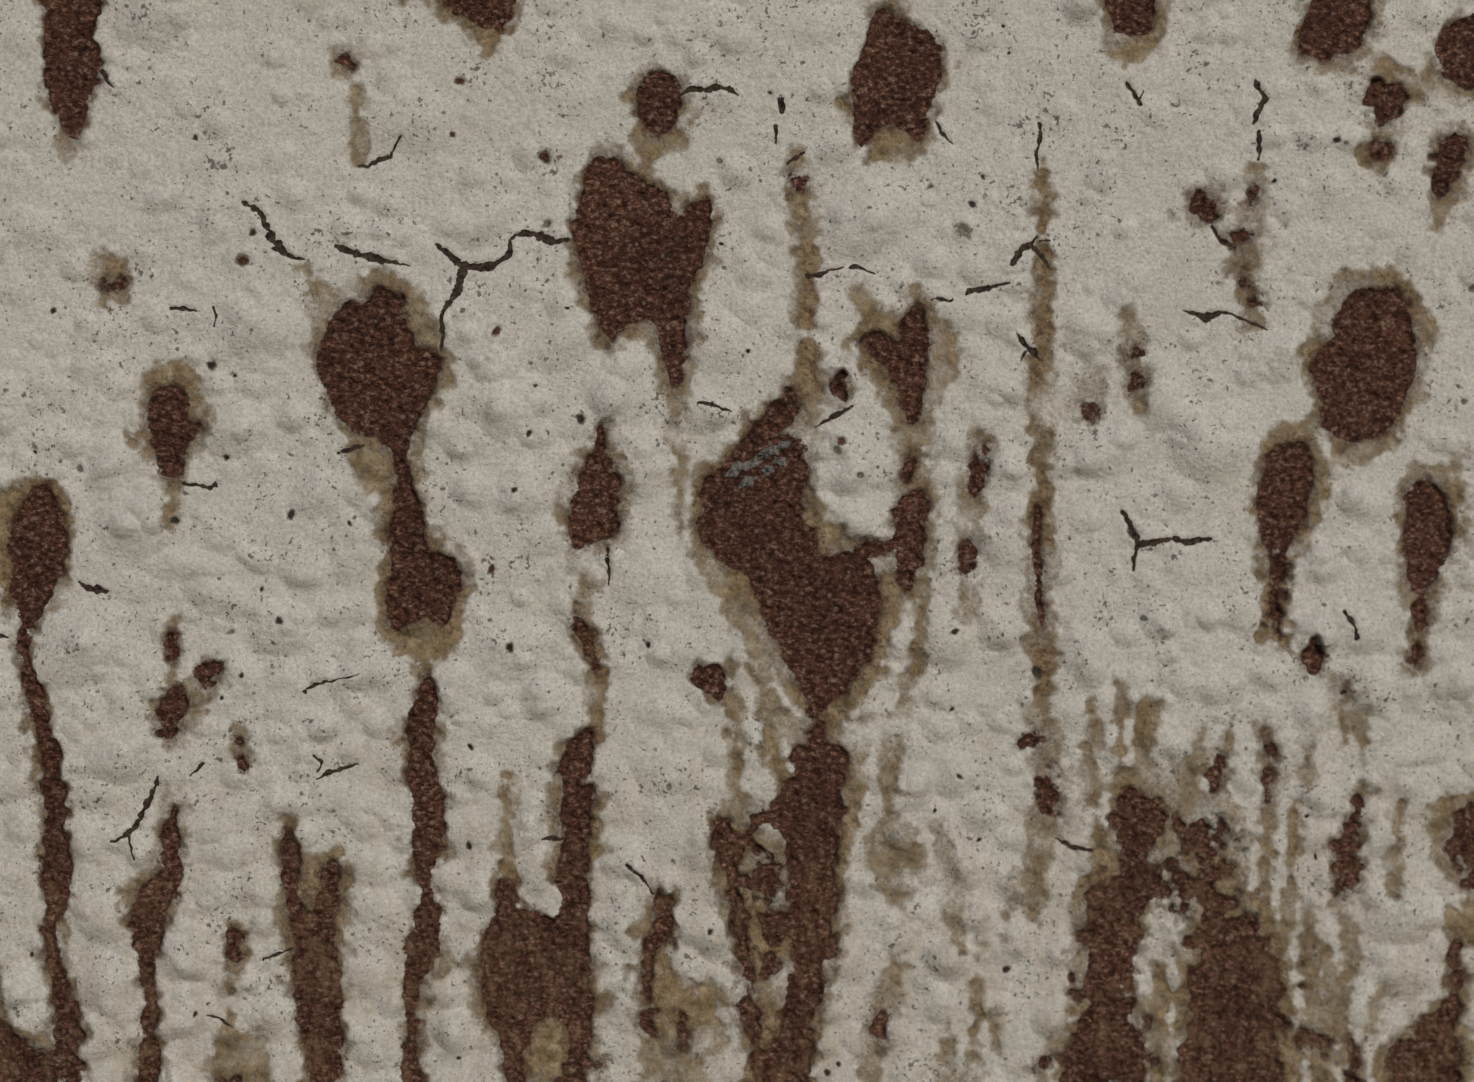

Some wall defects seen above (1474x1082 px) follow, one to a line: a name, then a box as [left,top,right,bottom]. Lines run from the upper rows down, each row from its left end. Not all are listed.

crack [241,200,571,352]
crack [1120,510,1213,571]